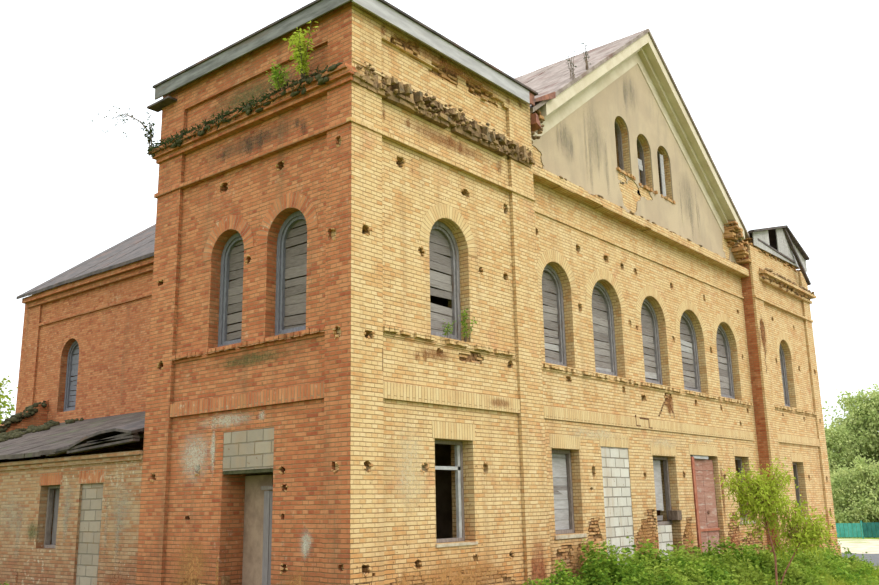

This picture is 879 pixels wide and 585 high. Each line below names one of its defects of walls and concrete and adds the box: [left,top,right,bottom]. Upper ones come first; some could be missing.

spalling [364,66,545,168]
peeling [618,171,653,215]
spalling [722,220,765,271]
spalling [459,353,482,364]
spalling [390,553,520,585]
spalling [530,518,603,585]
spalling [635,509,657,558]